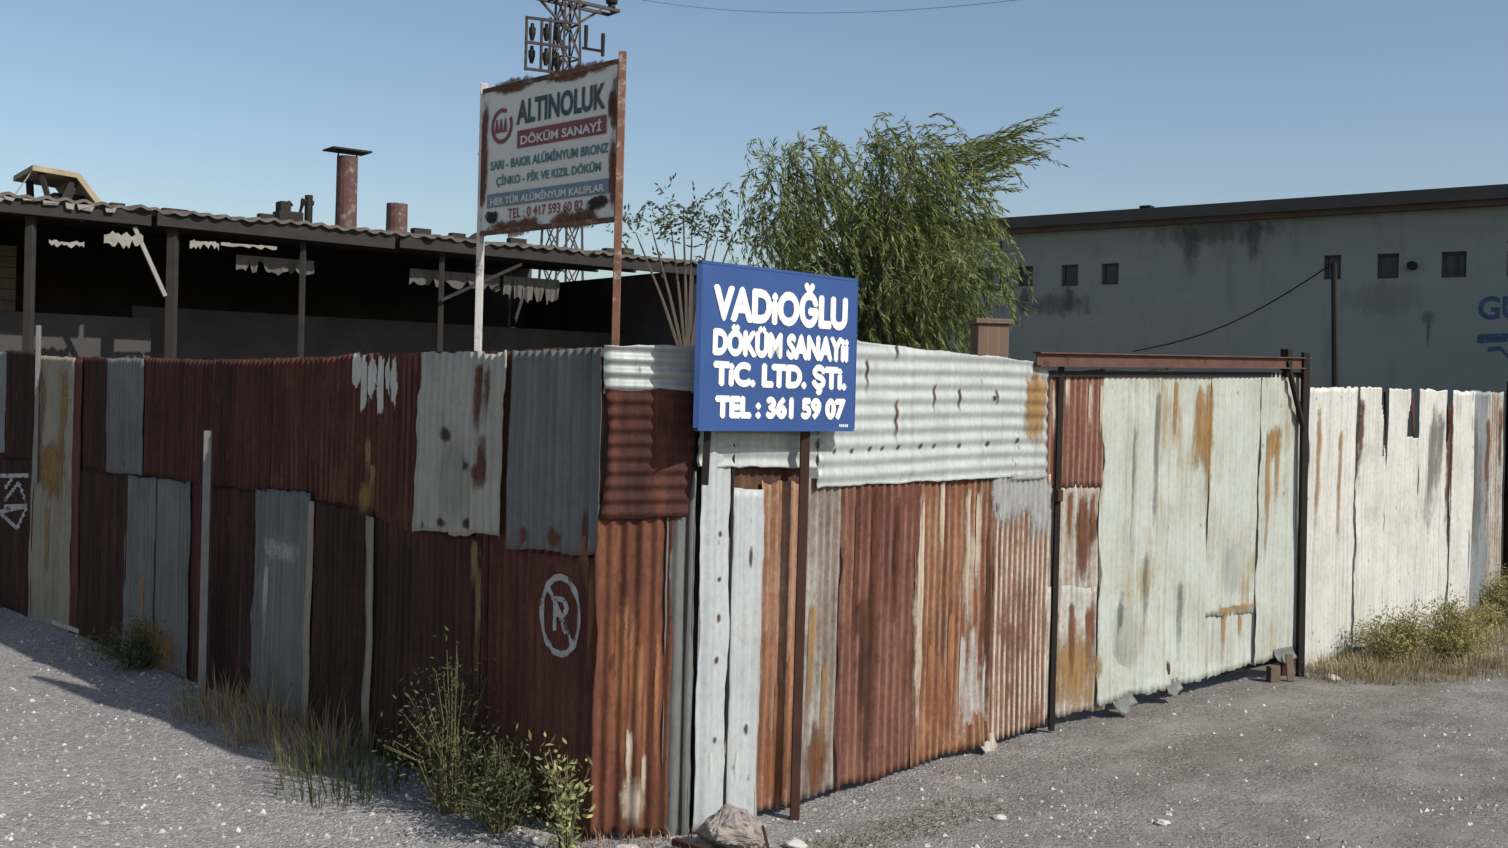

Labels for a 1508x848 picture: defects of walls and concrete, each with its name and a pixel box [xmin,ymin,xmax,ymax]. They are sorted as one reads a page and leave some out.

peeling [352,352,398,414]
corrosion [462,365,489,486]
corrosion [1016,374,1047,443]
corrosion [1068,492,1097,580]
corrosion [1195,385,1214,477]
corrosion [1265,427,1281,543]
corrosion [1316,408,1343,532]
corrosion [616,606,660,754]
corrosion [852,488,901,748]
corrosion [983,535,993,698]
corrosion [1056,601,1102,709]
corrosion [1221,604,1253,643]